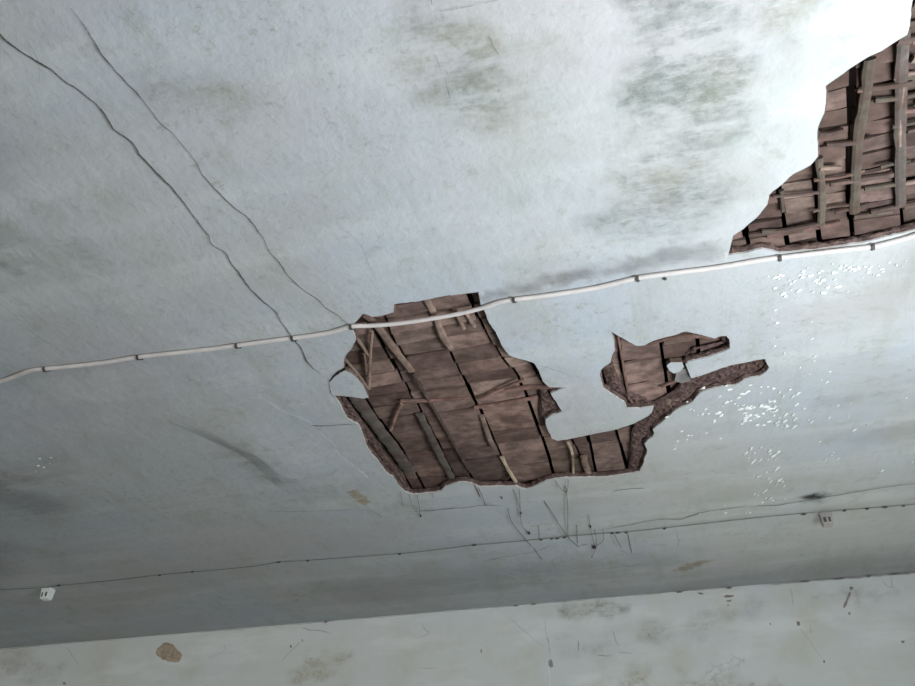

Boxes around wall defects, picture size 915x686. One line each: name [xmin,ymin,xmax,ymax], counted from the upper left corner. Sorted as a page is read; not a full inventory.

crack [0,24,334,371]
damp [626,72,721,105]
spalling [728,0,915,256]
spalling [329,292,814,560]
spalling [156,642,182,662]